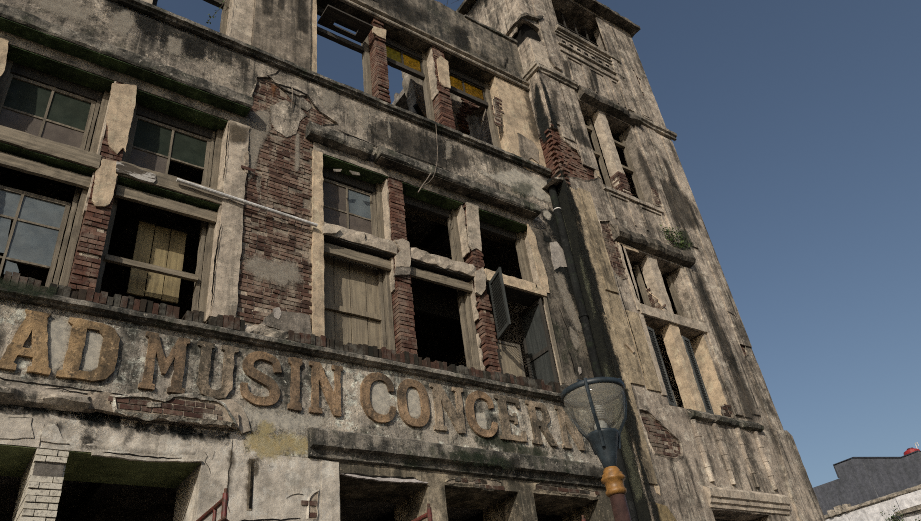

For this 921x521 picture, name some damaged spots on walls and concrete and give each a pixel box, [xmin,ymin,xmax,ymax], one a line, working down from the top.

leakage [297,0,307,33]
flaking render [372,26,386,40]
flaking render [0,37,9,77]
flaking render [437,56,451,89]
spalling [246,76,338,143]
flaking render [92,83,156,207]
spalling [517,124,633,196]
flaking render [321,224,341,235]
leakage [0,404,230,445]
spalling [108,392,251,434]
leakage [242,405,326,436]
leakage [245,458,259,497]